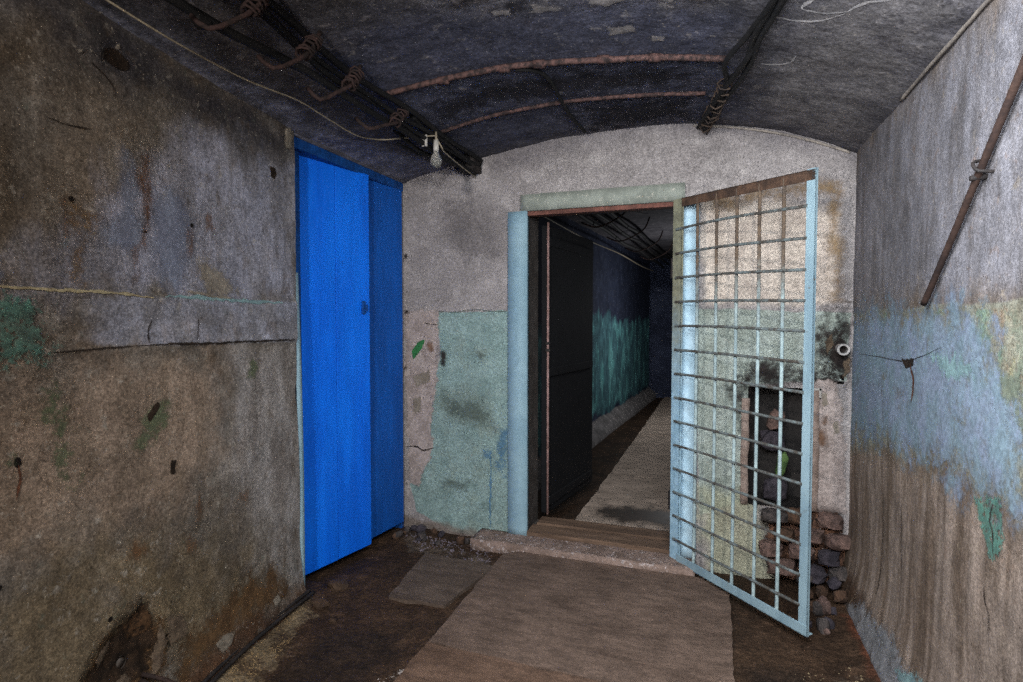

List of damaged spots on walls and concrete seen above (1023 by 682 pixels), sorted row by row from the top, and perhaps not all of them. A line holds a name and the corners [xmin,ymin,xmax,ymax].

peeling [0,285,283,370]
peeling [403,309,506,486]
peeling [763,290,1023,581]
flaking render [84,602,187,682]